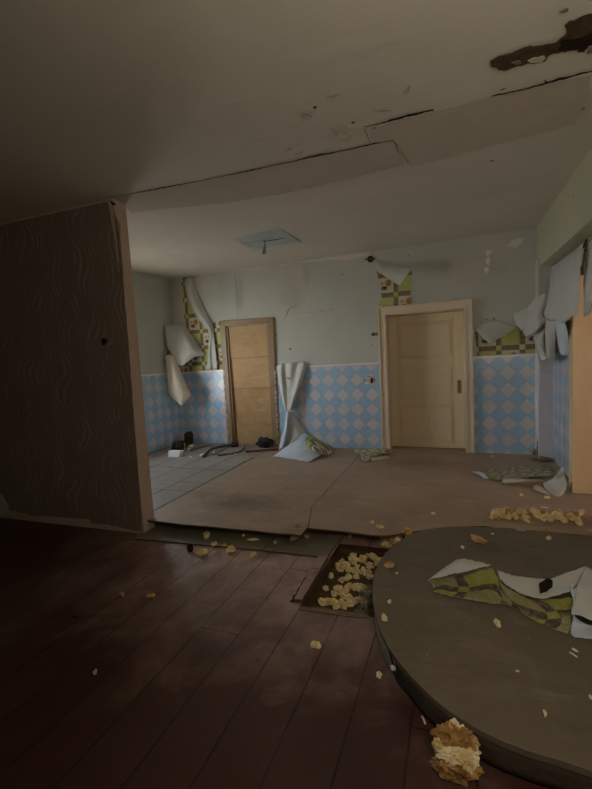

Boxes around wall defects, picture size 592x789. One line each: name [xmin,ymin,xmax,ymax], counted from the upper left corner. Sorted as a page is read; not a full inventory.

flaking render [490,8,592,71]